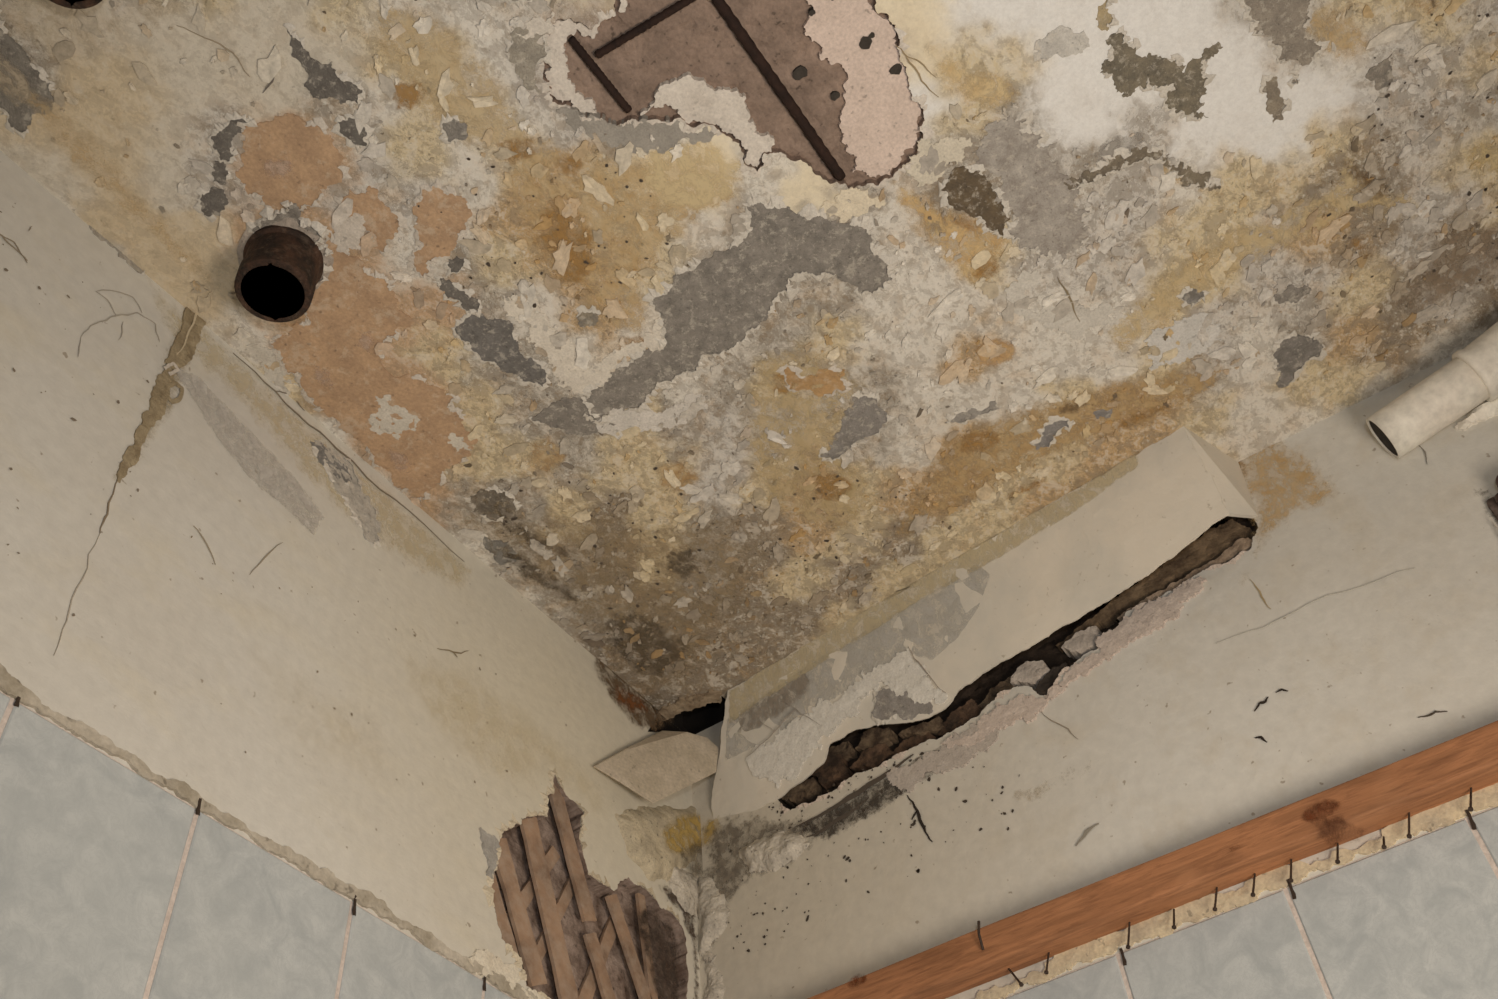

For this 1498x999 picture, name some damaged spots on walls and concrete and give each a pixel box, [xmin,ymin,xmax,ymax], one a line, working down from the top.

peeling [0,8,104,139]
peeling [89,225,145,276]
damp [379,10,738,343]
damp [1114,151,1407,350]
damp [1400,206,1498,308]
spalling [174,0,1498,814]
damp [483,495,807,732]
crack [908,647,946,693]
damp [729,456,1137,719]
damp [665,750,967,952]
crack [797,754,933,842]
peeling [505,943,551,999]